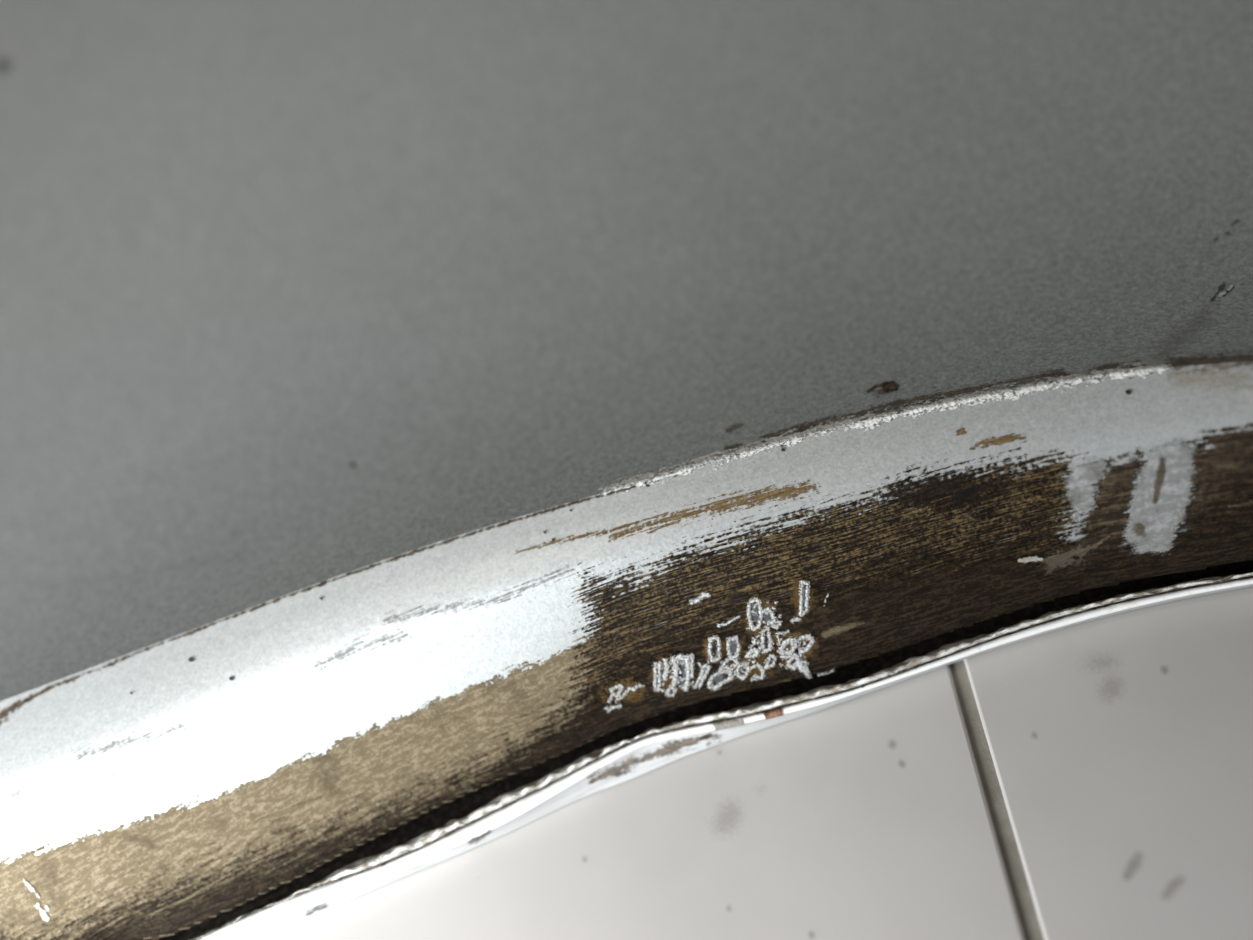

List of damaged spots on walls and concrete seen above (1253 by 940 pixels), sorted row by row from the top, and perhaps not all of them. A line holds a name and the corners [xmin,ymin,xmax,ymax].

water stain [1064,458,1110,521]
water stain [1123,440,1195,554]
peeling [712,717,744,731]
peeling [762,707,783,720]